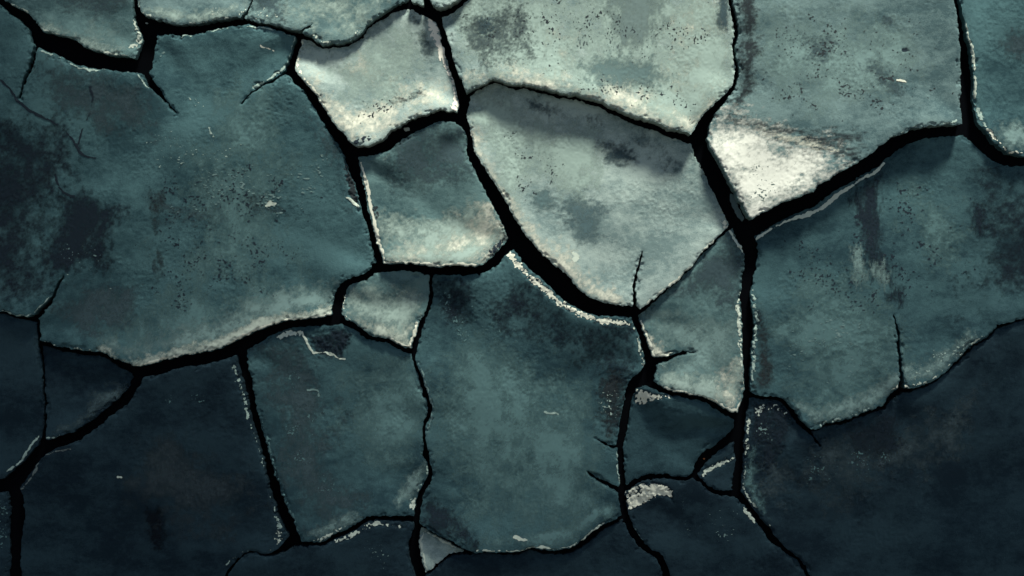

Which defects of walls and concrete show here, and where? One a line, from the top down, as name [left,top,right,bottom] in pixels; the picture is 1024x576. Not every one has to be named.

crack [0,0,643,576]
crack [488,0,1024,576]